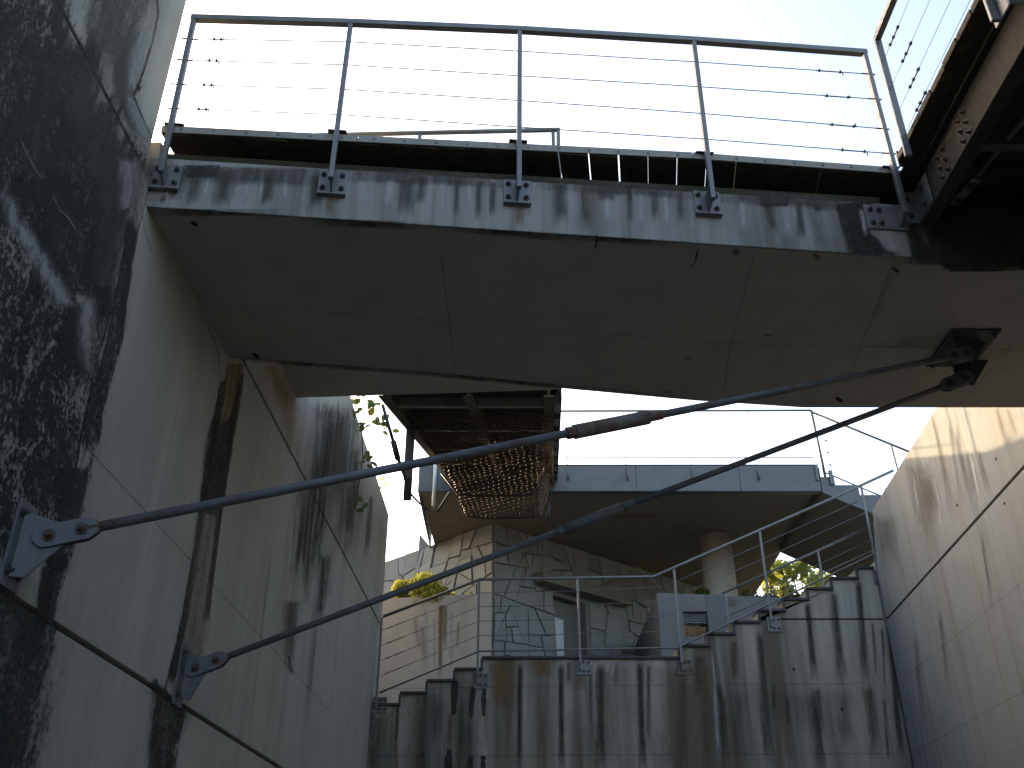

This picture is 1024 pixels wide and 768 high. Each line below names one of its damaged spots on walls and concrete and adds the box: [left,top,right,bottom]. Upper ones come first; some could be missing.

leakage [0,0,153,558]
leakage [161,165,319,216]
leakage [375,171,495,210]
leakage [477,229,544,239]
leakage [738,192,1024,265]
leakage [148,309,259,768]
leakage [297,406,359,615]
leakage [0,544,75,768]
leakage [559,663,570,757]
leakage [638,663,653,756]
leakage [805,605,815,664]
leakage [856,583,902,748]